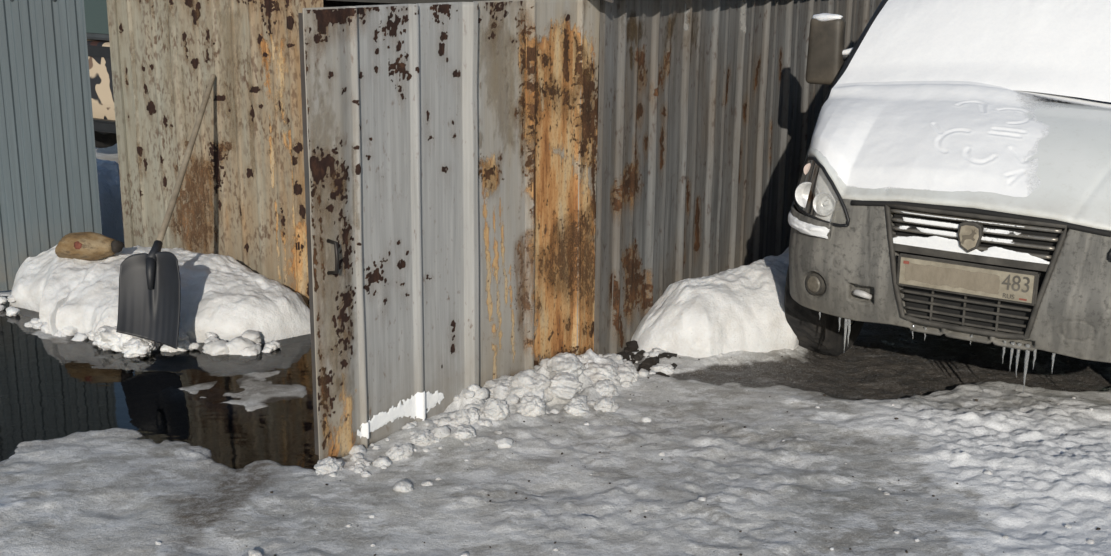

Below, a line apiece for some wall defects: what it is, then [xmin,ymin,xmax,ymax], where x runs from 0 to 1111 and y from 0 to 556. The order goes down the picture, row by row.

rust [169,0,215,69]
rust [142,64,173,128]
rust [610,16,676,211]
rust [137,141,232,254]
rust [236,0,461,458]
rust [477,1,599,379]
rust [684,181,700,252]
rust [610,237,653,349]